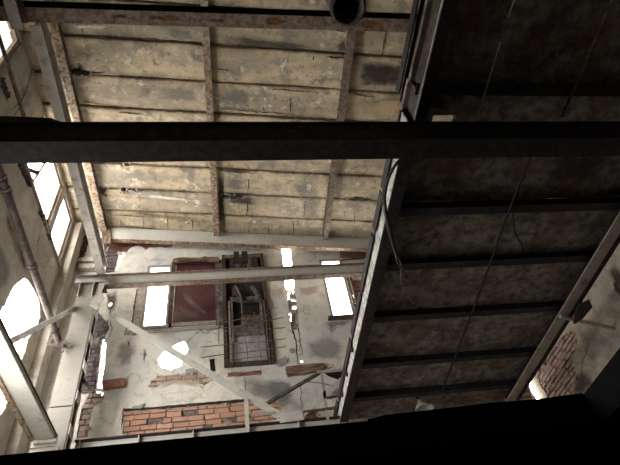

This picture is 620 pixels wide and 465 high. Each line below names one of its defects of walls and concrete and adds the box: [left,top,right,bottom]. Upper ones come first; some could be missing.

leakage [361,66,400,85]
flaking render [104,242,172,273]
crack [288,306,306,361]
leakage [311,341,338,357]
flaking render [77,313,109,440]
flaking render [148,370,213,390]
leakage [253,383,289,400]
spalling [367,330,600,453]
flaking render [123,401,283,435]